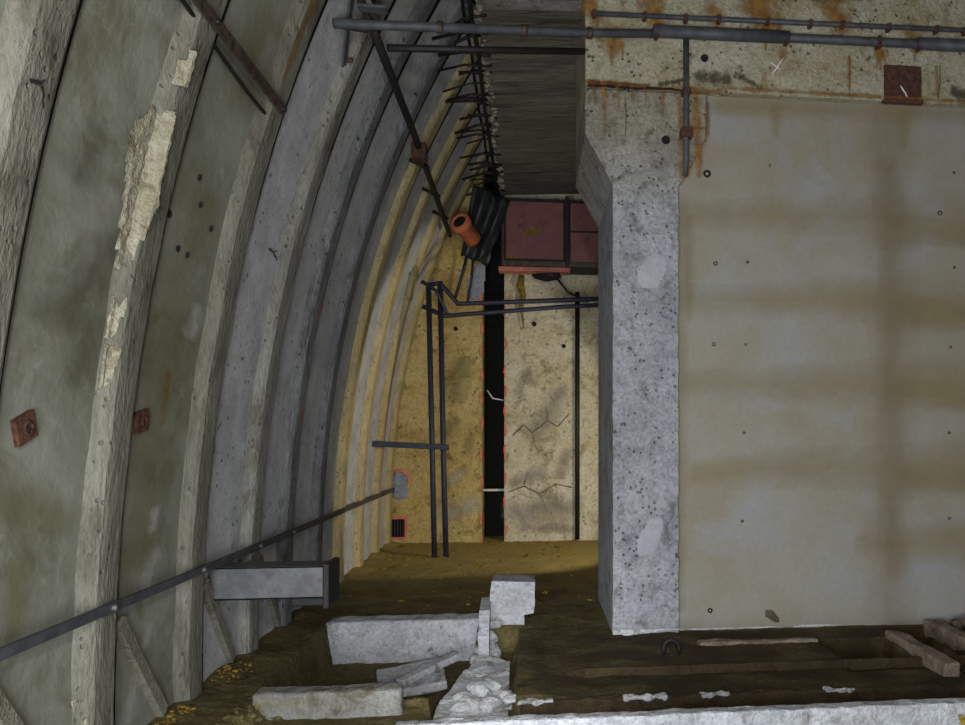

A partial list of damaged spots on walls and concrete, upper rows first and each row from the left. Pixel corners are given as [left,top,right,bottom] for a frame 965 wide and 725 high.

peeling [172,50,197,89]
rust [586,80,650,128]
rust [746,88,926,100]
rust [661,87,731,182]
peeling [113,104,176,270]
peeling [98,294,127,389]
crack [513,408,569,447]
crack [509,474,573,507]